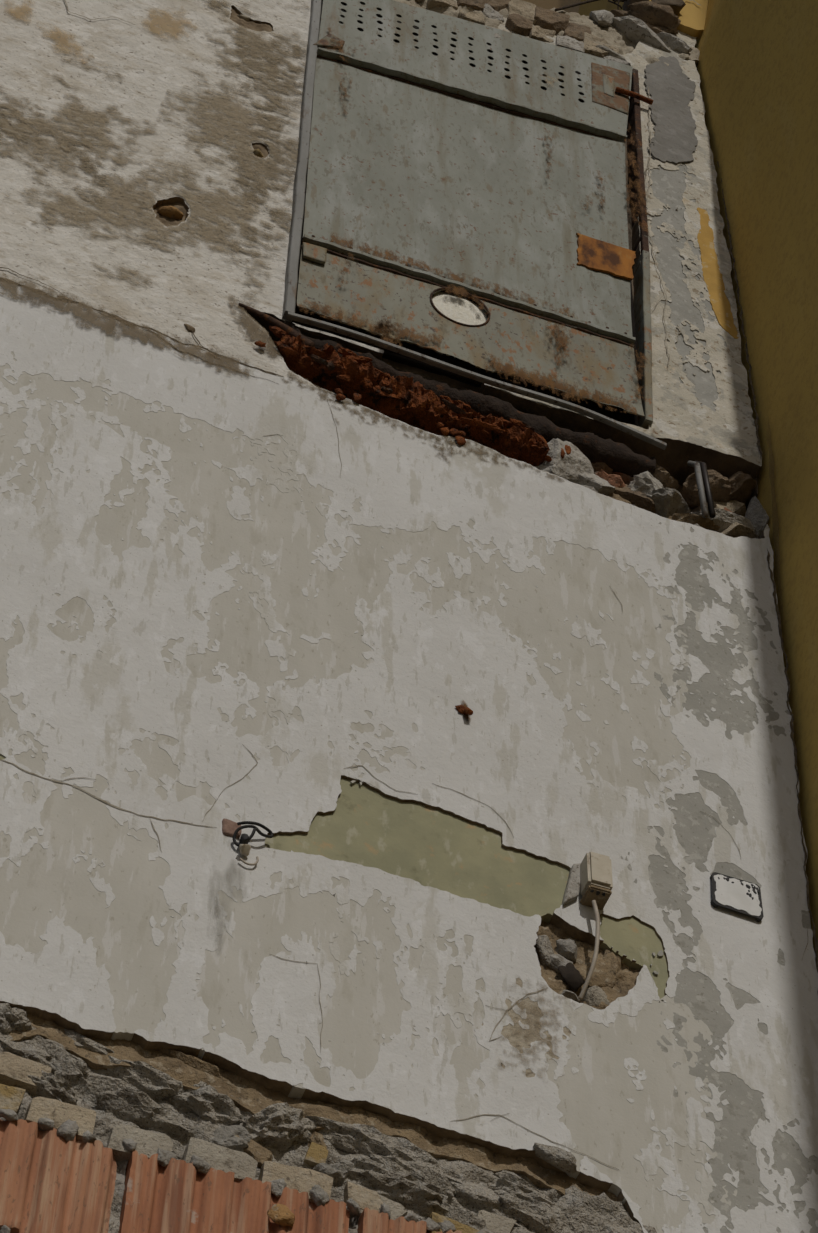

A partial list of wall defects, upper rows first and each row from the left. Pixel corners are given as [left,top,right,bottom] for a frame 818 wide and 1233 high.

spalling [360,0,520,35]
spalling [0,0,305,297]
peeling [533,7,736,412]
corrosion [229,300,571,480]
corrosion [327,235,647,414]
crack [0,749,258,852]
peeling [0,352,818,1233]